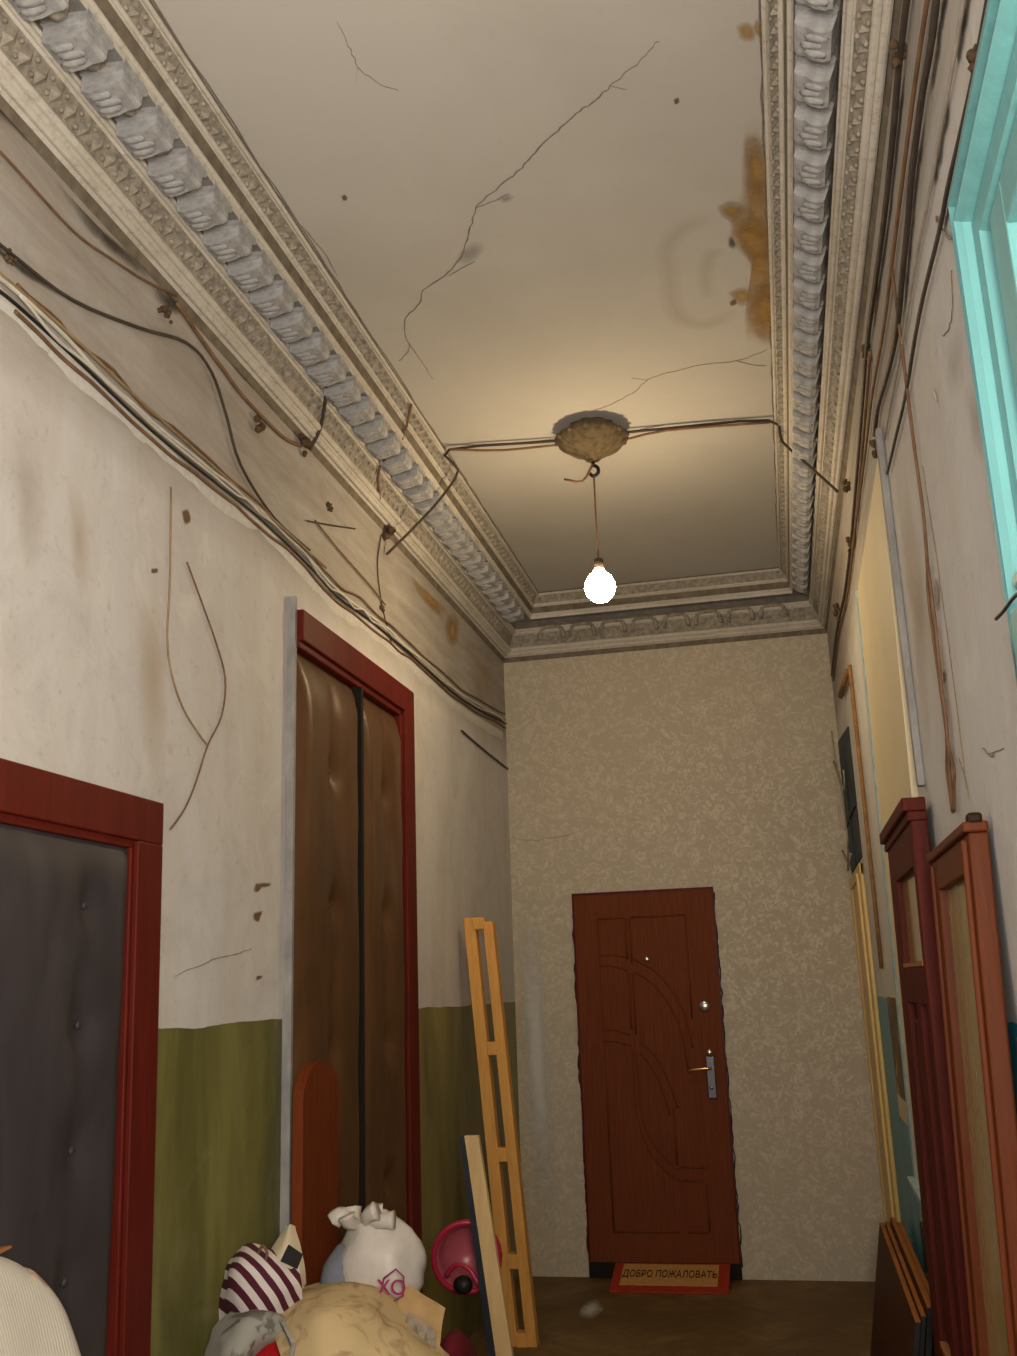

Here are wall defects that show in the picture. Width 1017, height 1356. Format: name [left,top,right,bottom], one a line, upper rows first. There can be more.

crack [152,0,659,567]
damp [723,151,771,330]